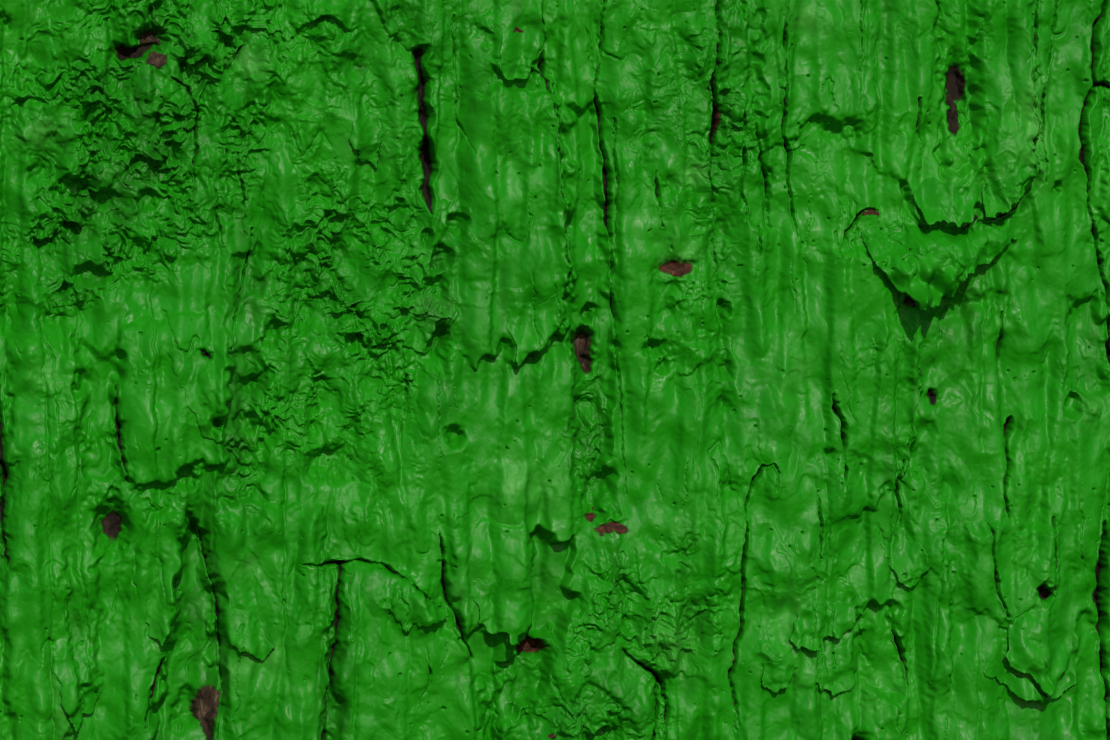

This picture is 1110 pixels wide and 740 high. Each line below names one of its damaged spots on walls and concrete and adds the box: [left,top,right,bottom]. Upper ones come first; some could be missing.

crack [414,49,432,214]
peeling [944,65,965,135]
crack [1078,4,1110,363]
peeling [659,261,692,277]
peeling [585,507,628,536]
crack [309,559,405,688]
crack [440,538,471,657]
crack [728,537,746,719]
crack [1092,524,1108,740]
peeling [190,685,221,740]
crack [628,655,667,740]